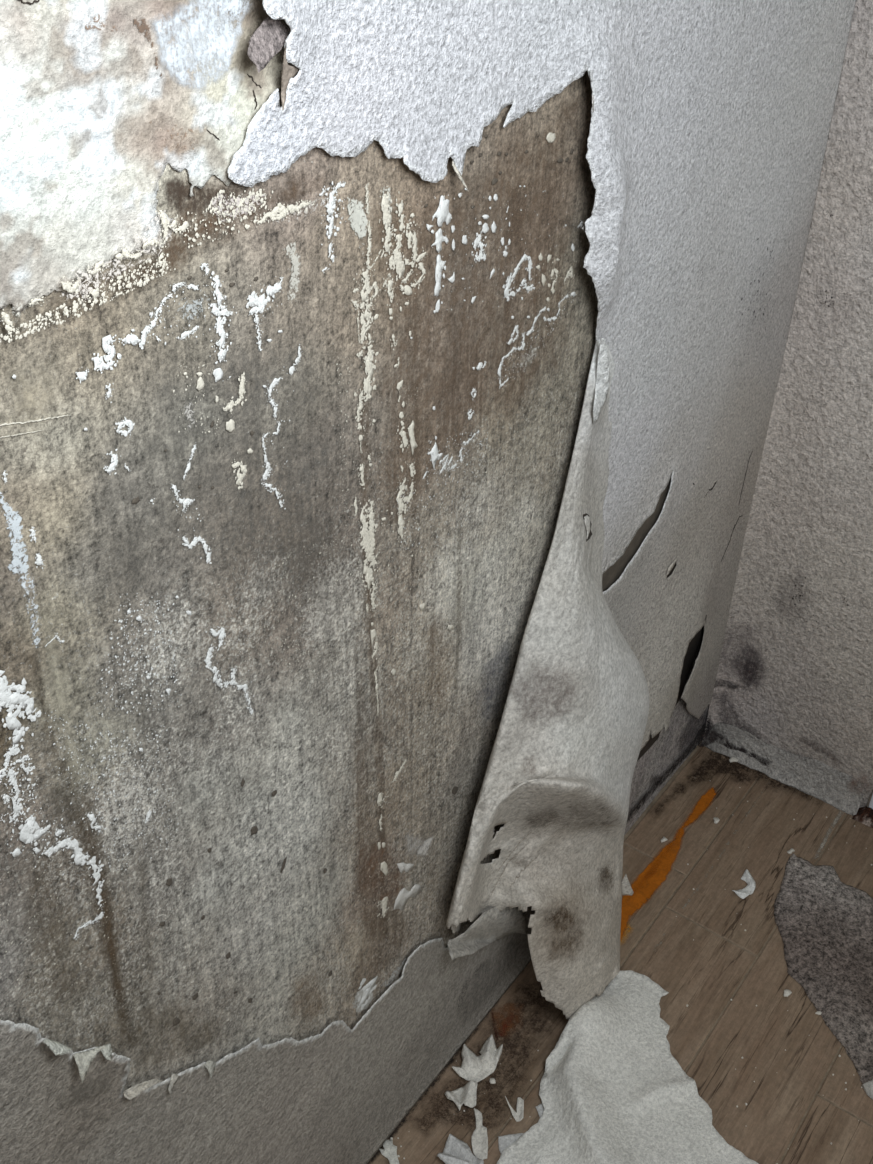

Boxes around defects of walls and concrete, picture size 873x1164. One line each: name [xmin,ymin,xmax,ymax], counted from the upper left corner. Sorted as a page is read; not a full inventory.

peeling [0,0,295,331]
leakage [159,179,262,263]
peeling [245,183,345,272]
peeling [172,445,214,510]
peeling [211,374,245,432]
peeling [231,348,301,506]
peeling [354,380,479,714]
peeling [352,171,575,486]
leakage [380,131,570,492]
peeling [205,627,253,713]
peeling [377,792,414,876]
leakage [67,799,210,1049]